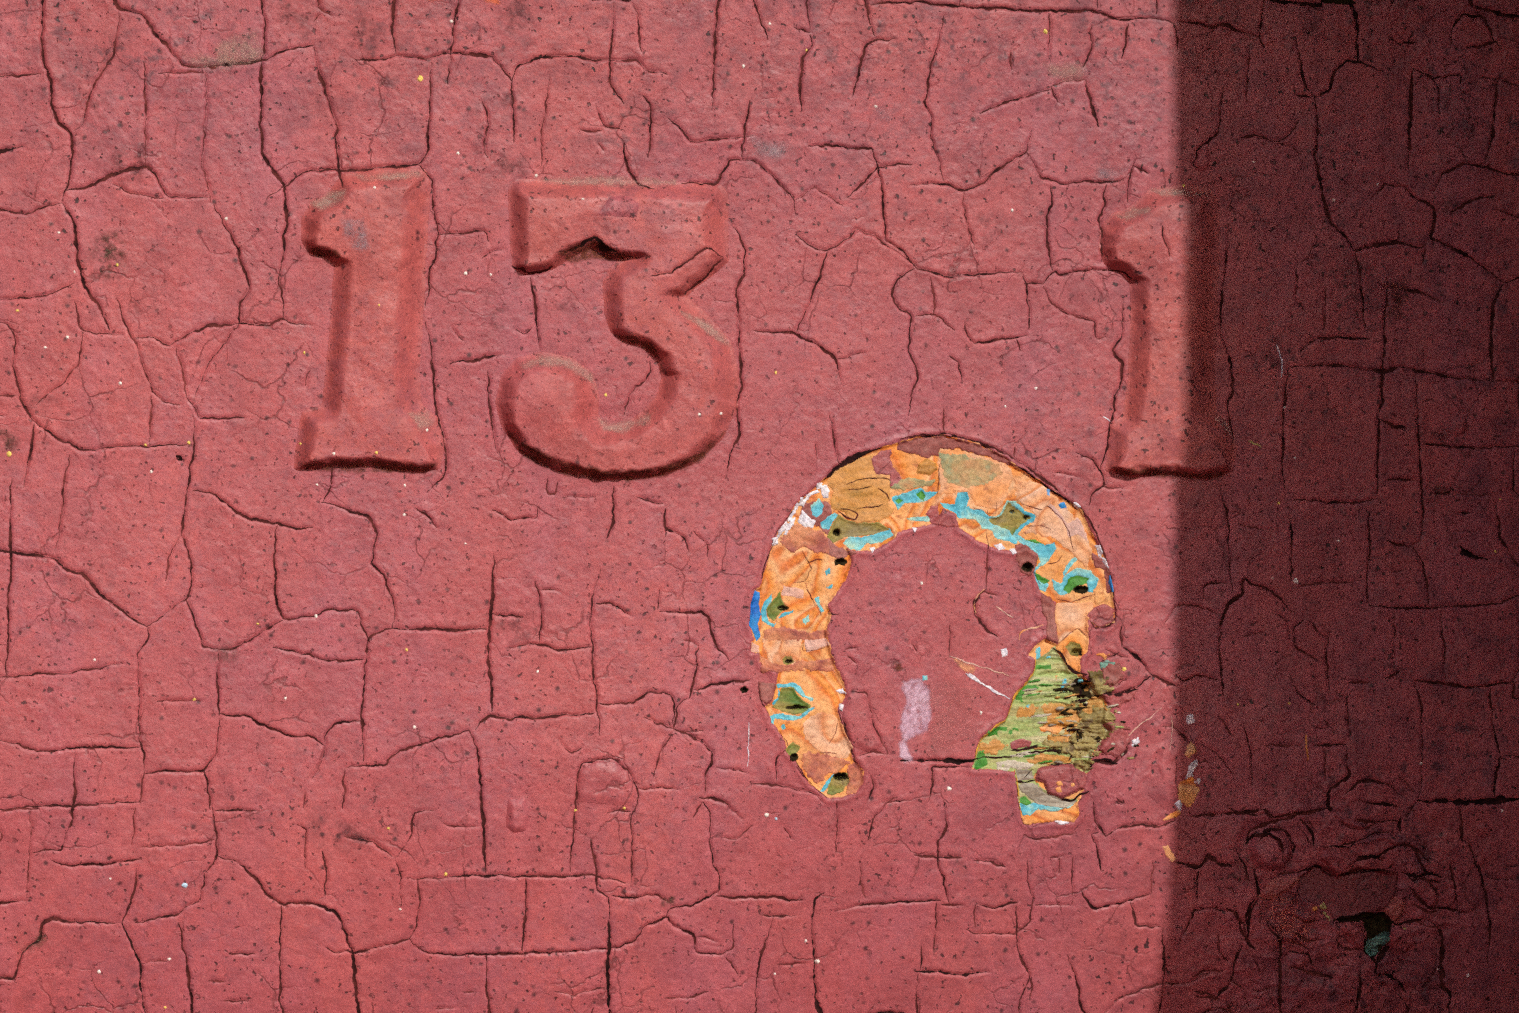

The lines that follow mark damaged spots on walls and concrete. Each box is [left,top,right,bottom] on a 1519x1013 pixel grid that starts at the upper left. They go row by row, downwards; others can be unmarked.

crack [0,0,838,1013]
peeling [740,433,1140,825]
crack [644,0,1323,510]
crack [836,0,1519,1013]
peeling [1258,809,1415,959]